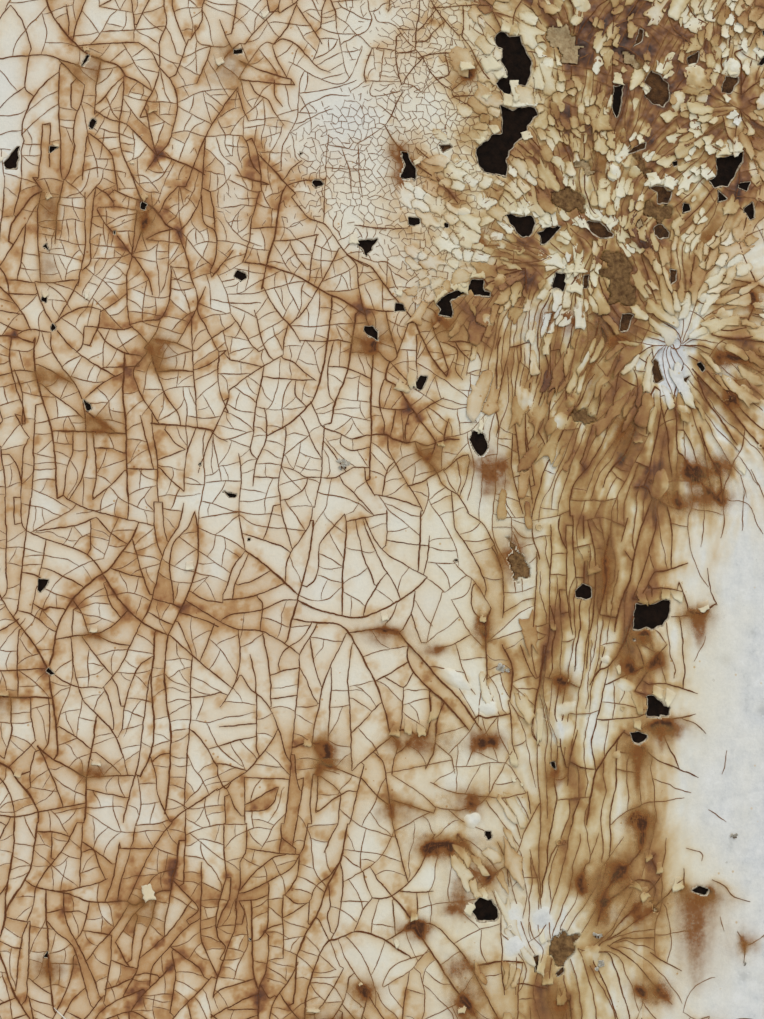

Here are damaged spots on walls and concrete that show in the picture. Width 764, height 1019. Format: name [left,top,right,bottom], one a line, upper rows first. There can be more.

crack [528,0,698,300]
crack [656,0,764,292]
peeling [394,0,764,531]
crack [525,290,585,452]
rust [498,535,530,580]
peeling [632,584,671,642]
peeling [620,685,677,745]
rust [446,863,499,916]
peeling [450,792,567,1005]
rust [550,931,580,967]
crack [578,948,618,1019]
rust [680,885,718,961]